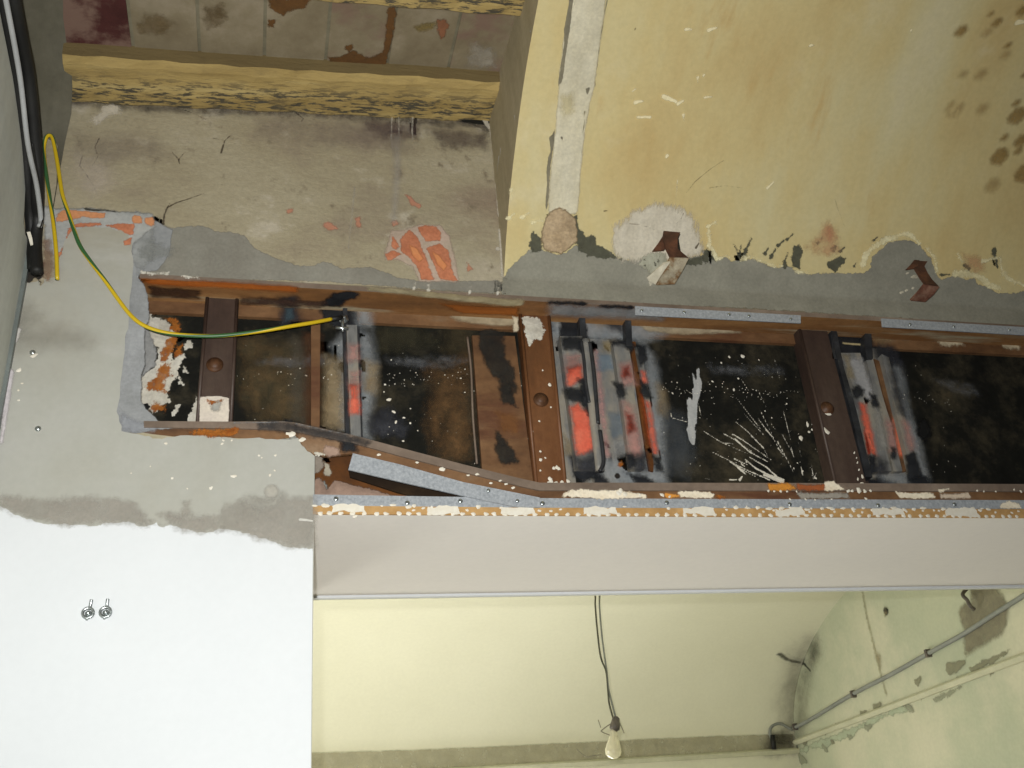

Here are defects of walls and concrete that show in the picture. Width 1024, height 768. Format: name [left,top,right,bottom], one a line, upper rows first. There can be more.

leakage [1009,101,1024,123]
leakage [992,135,1024,164]
spalling [27,204,1024,325]
peeling [172,398,197,421]
leakage [43,500,144,525]
leakage [167,510,216,530]
leakage [233,500,315,546]
leakage [959,589,1007,654]
peeling [933,649,1008,701]
peeling [798,702,914,764]